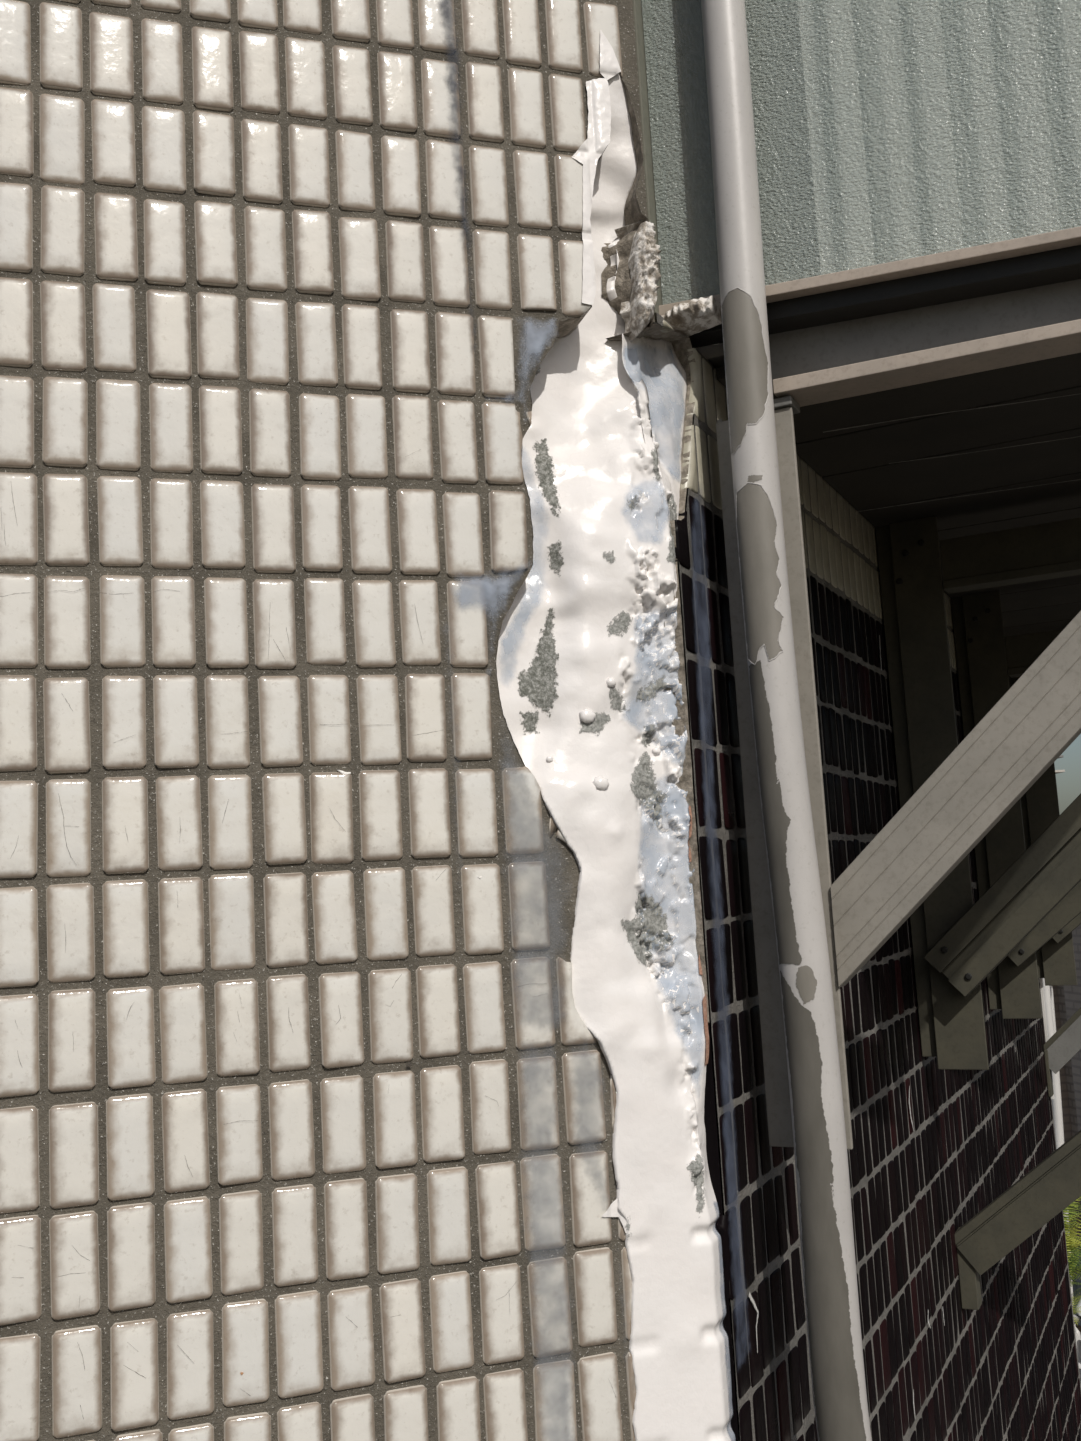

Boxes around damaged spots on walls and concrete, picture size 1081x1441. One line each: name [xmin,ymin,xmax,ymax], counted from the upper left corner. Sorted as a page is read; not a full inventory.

peeling [721,287,769,455]
spalling [496,433,564,767]
spalling [555,72,724,1235]
peeling [736,475,866,1441]
spalling [722,1261,739,1441]